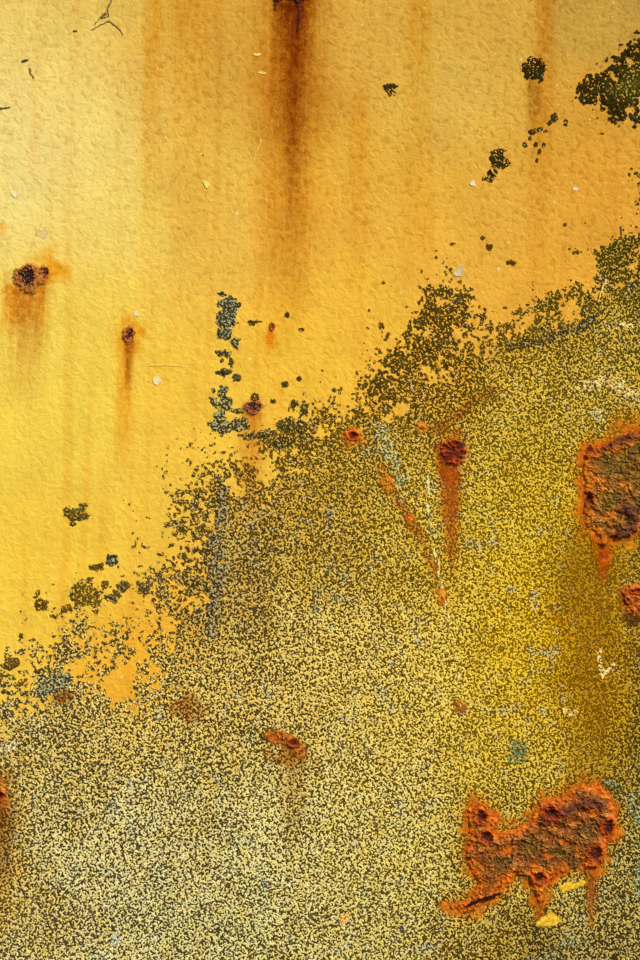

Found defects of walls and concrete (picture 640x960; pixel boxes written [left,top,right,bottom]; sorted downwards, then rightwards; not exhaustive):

rust [13,263,50,294]
rust [123,325,136,348]
rust [439,438,470,476]
rust [575,421,640,567]
rust [620,582,640,625]
rust [263,728,309,761]
rust [441,780,625,927]